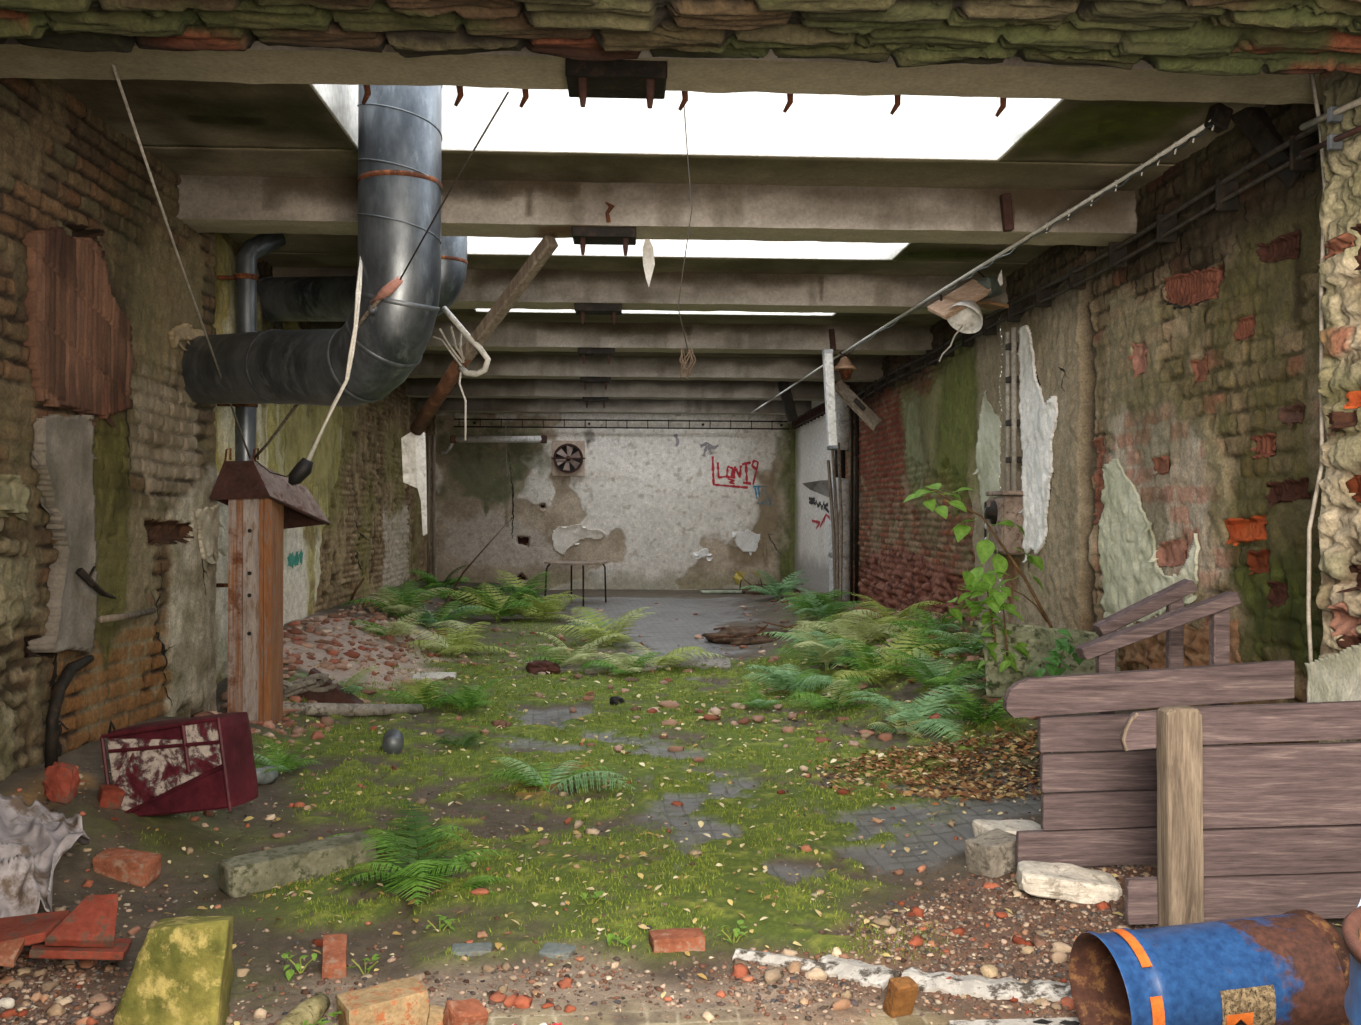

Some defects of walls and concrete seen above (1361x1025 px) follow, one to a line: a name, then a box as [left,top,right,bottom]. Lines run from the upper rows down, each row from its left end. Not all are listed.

spalling [67,224,105,248]
spalling [1163,264,1225,305]
peeling [168,323,205,351]
peeling [1017,325,1059,562]
spalling [1092,436,1106,525]
spalling [1150,456,1170,477]
peeling [144,503,226,564]
peeling [552,524,605,555]
peeling [693,548,713,561]
peeling [732,529,760,555]
spalling [1148,538,1188,568]
spalling [1224,477,1311,608]